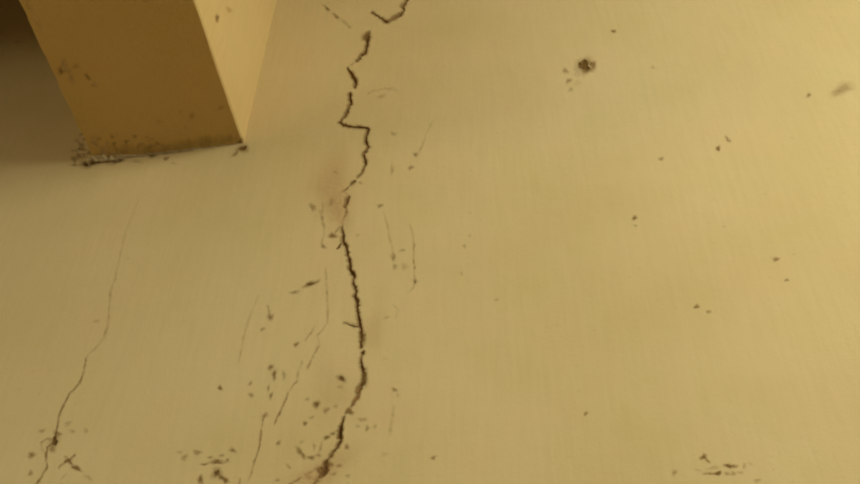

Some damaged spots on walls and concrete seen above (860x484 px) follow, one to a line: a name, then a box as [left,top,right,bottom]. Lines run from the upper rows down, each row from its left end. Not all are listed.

spalling [83,139,247,167]
crack [314,0,408,484]